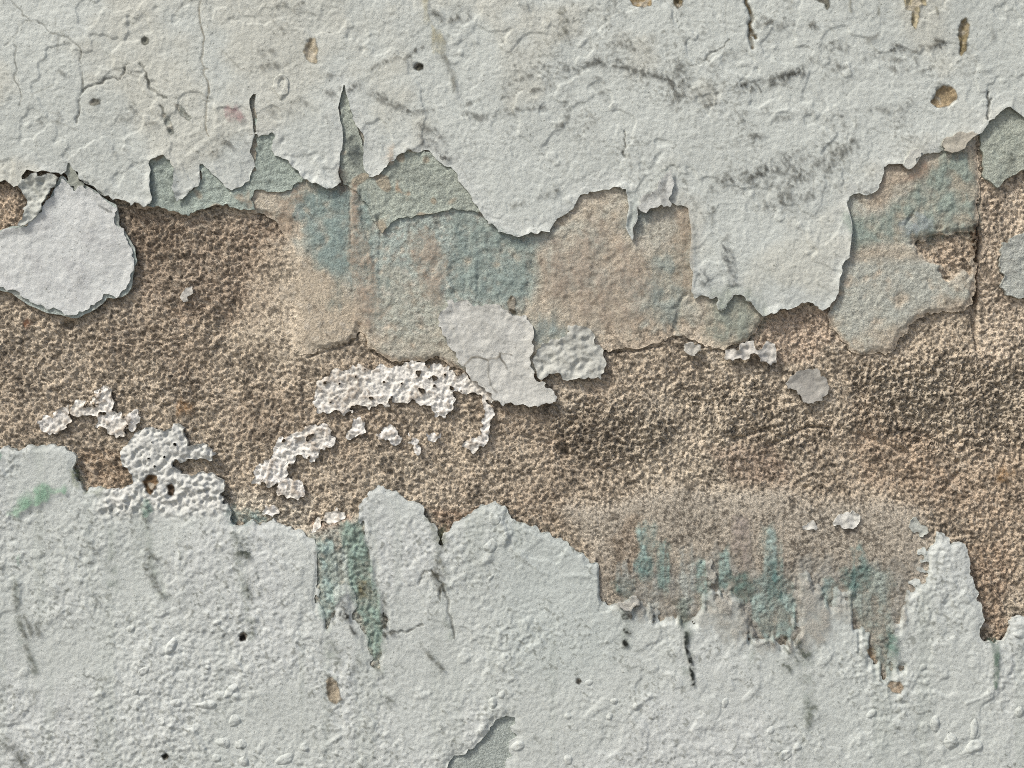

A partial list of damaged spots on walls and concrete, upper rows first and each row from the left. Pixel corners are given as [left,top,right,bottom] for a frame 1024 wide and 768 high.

crack [722,0,757,49]
spalling [0,85,1024,693]
damp [333,521,381,657]
damp [616,516,778,646]
damp [780,546,918,651]
peeling [447,716,517,768]